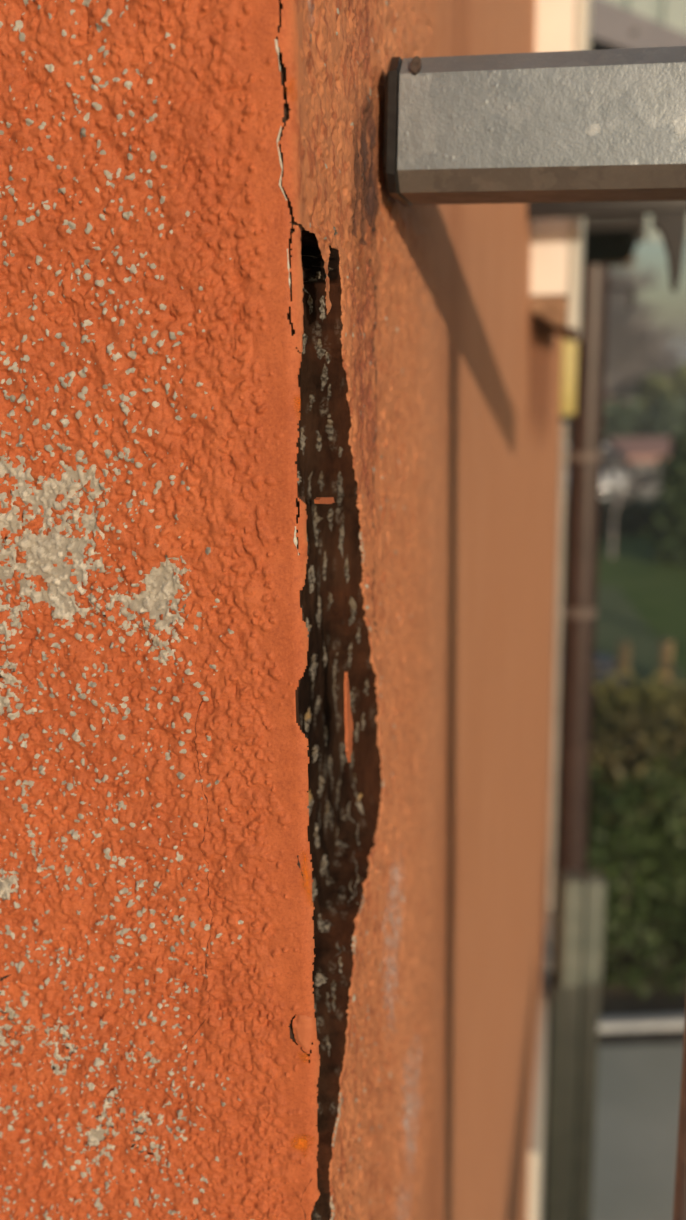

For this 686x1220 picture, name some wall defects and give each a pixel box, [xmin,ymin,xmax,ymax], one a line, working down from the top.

crack [275,0,299,349]
peeling [0,451,191,716]
flaking render [293,224,385,1220]